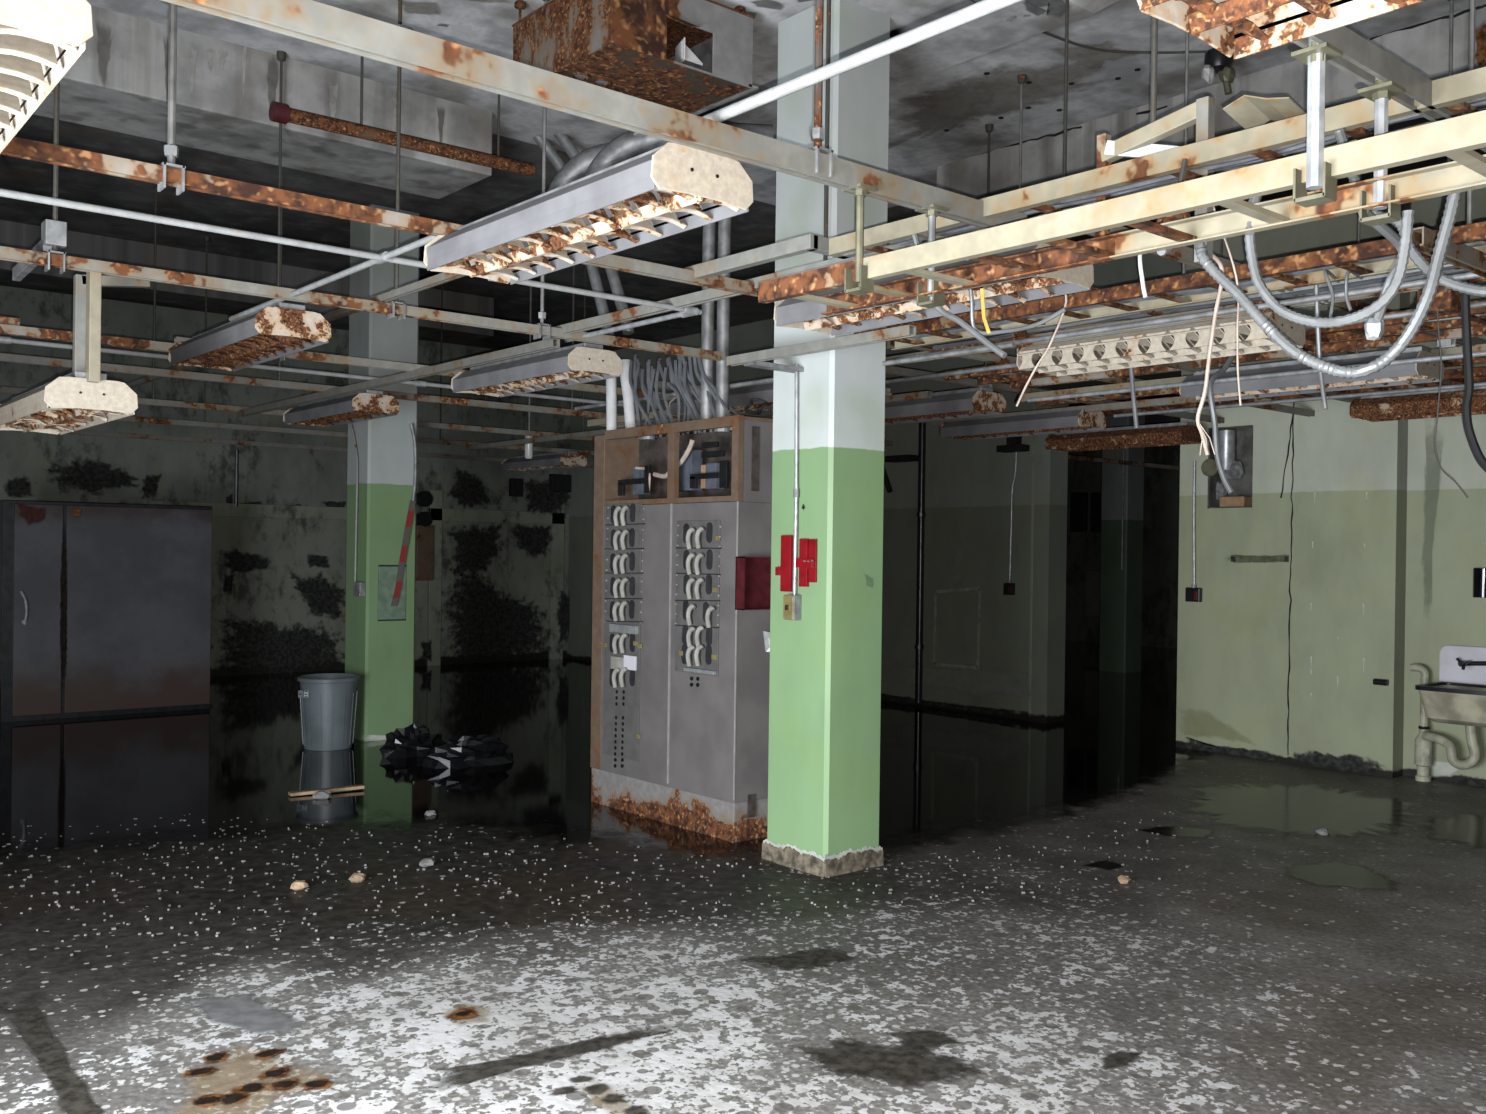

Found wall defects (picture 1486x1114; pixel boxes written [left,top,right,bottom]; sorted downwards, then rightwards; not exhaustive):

water stain [5,477,32,498]
water stain [48,460,161,498]
water stain [449,469,490,508]
water stain [421,479,570,664]
water stain [211,549,346,674]
rust [181,1051,227,1077]
rust [193,1049,332,1107]
water stain [798,1031,982,1086]